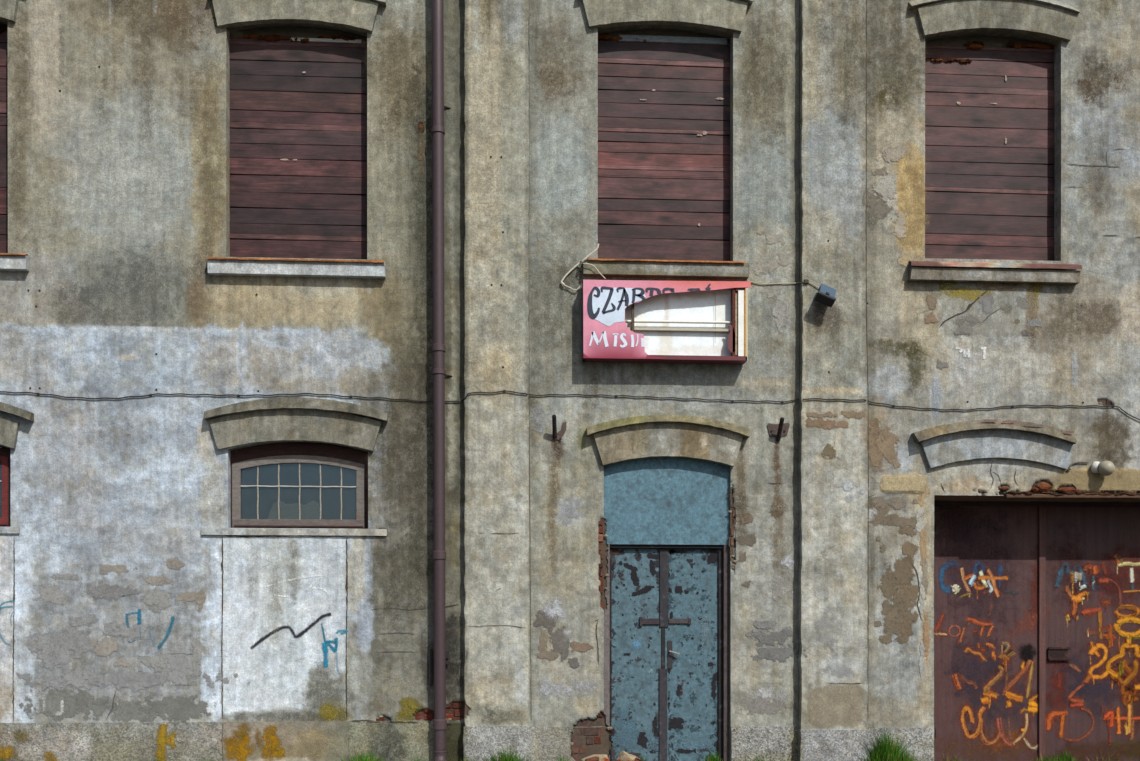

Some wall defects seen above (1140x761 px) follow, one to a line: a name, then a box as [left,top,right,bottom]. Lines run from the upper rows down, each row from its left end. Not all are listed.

crack [940,290,999,327]
peeling [805,410,930,679]
rust [942,518,1038,633]
rust [1050,545,1140,605]
peeling [17,557,250,725]
peeling [533,610,593,669]
spalling [570,485,756,761]
peeling [746,620,807,663]
spalling [415,701,470,722]
rust [948,635,1038,751]
rust [1065,648,1118,709]